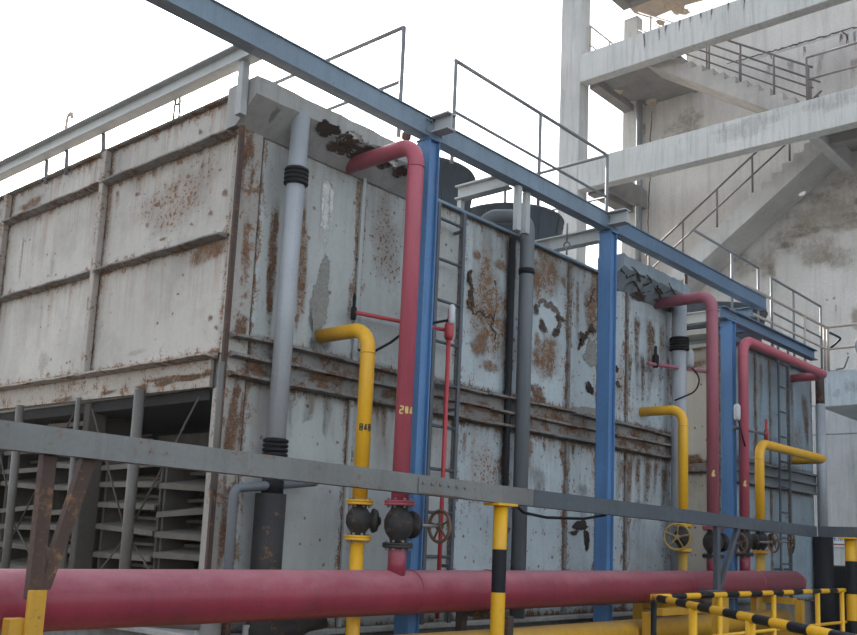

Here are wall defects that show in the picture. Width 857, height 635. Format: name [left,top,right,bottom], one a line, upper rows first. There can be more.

rust [129,158,223,241]
peeling [326,130,381,159]
peeling [374,160,407,178]
rust [240,217,252,282]
peeling [309,256,330,349]
crack [474,309,497,340]
rust [468,247,516,372]
peeling [534,298,567,337]
peeling [578,323,597,367]
peeling [621,267,676,312]
rust [224,361,267,451]
rust [217,476,237,566]